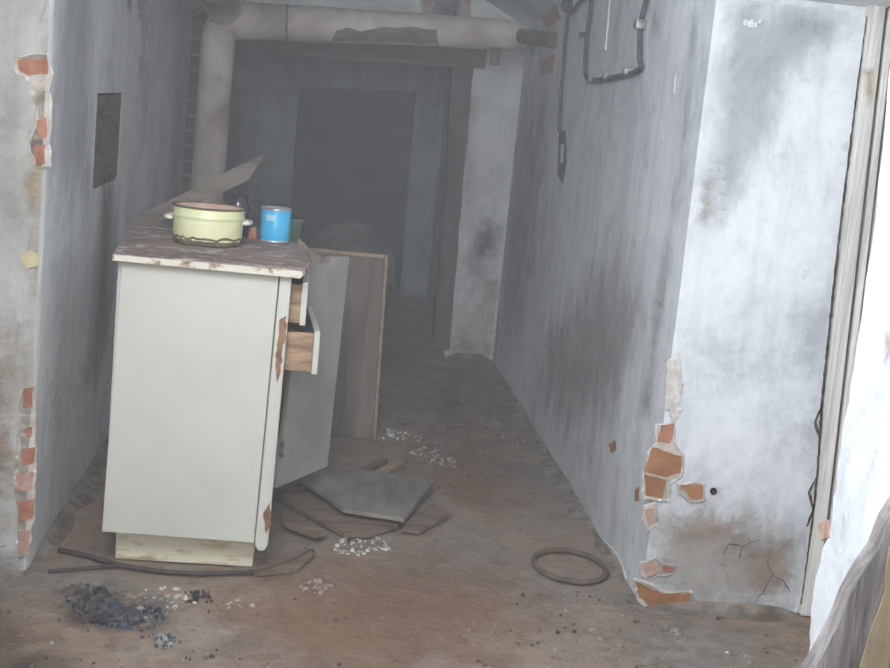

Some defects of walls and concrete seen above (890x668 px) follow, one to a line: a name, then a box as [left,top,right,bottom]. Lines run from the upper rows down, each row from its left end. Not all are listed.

flaking render [13,52,54,168]
crack [722,16,867,605]
flaking render [13,385,37,558]
flaking render [635,352,717,531]
flaking render [605,542,693,607]